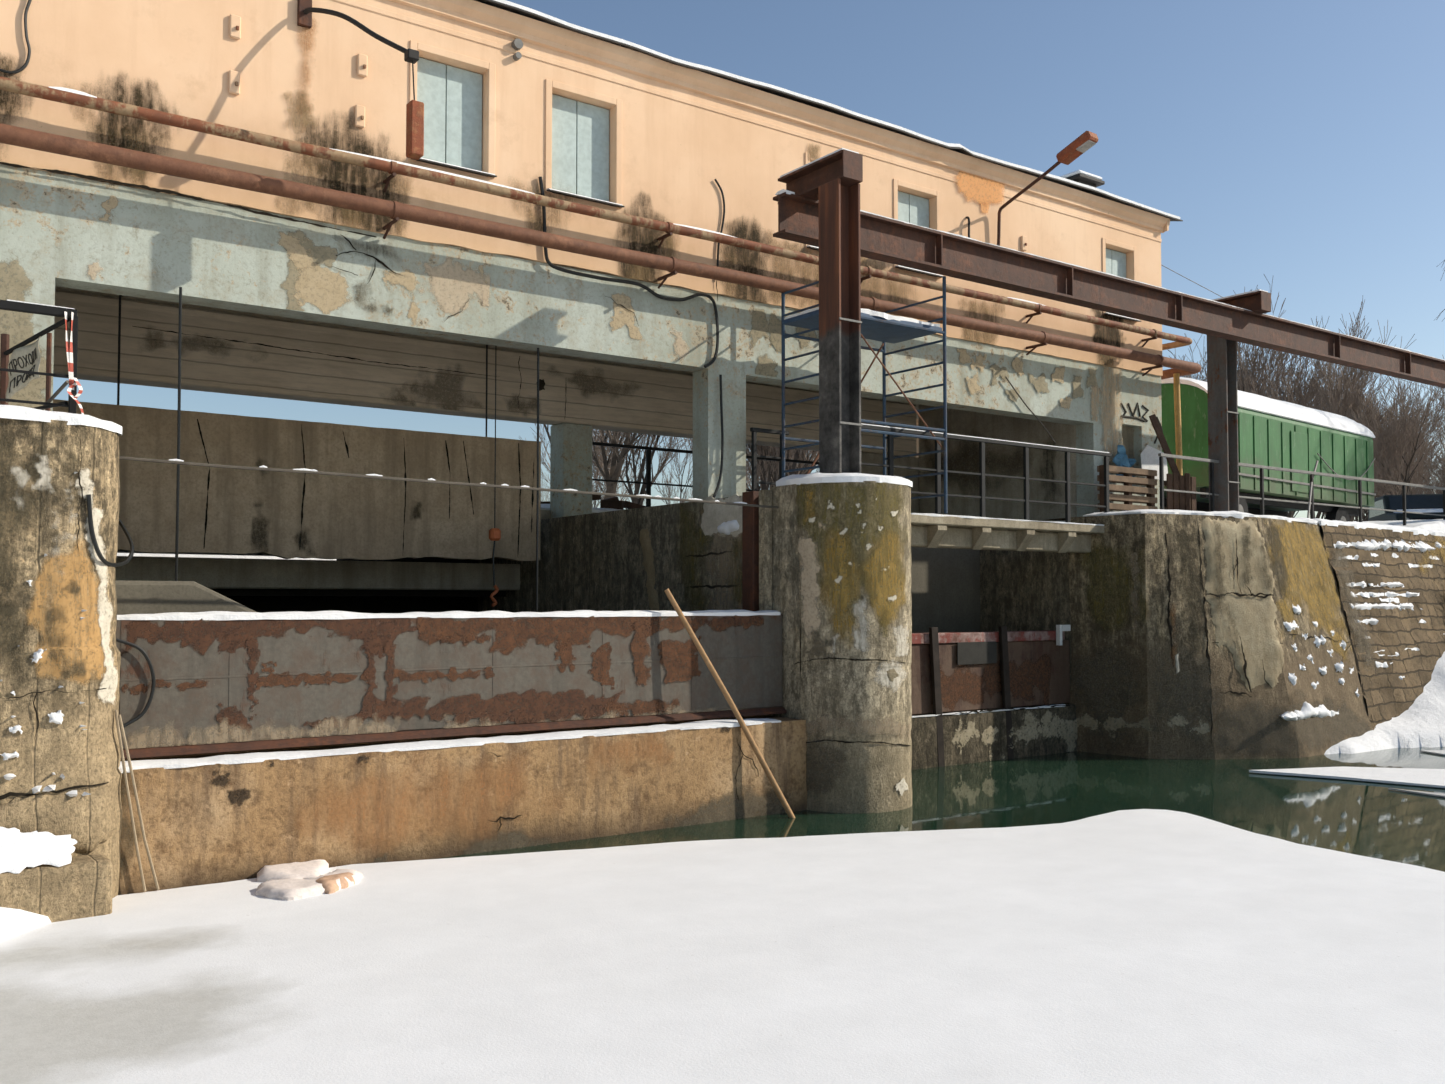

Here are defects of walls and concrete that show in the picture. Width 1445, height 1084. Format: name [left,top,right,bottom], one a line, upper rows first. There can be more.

water stain [96,78,168,154]
corrosion [290,26,316,127]
water stain [300,117,407,254]
peeling [0,259,53,411]
peeling [278,230,357,315]
peeling [383,258,490,327]
water stain [724,218,819,303]
water stain [0,427,106,683]
crack [0,688,106,745]
corrosion [121,615,764,742]
crack [1165,526,1376,744]
crack [0,782,109,800]